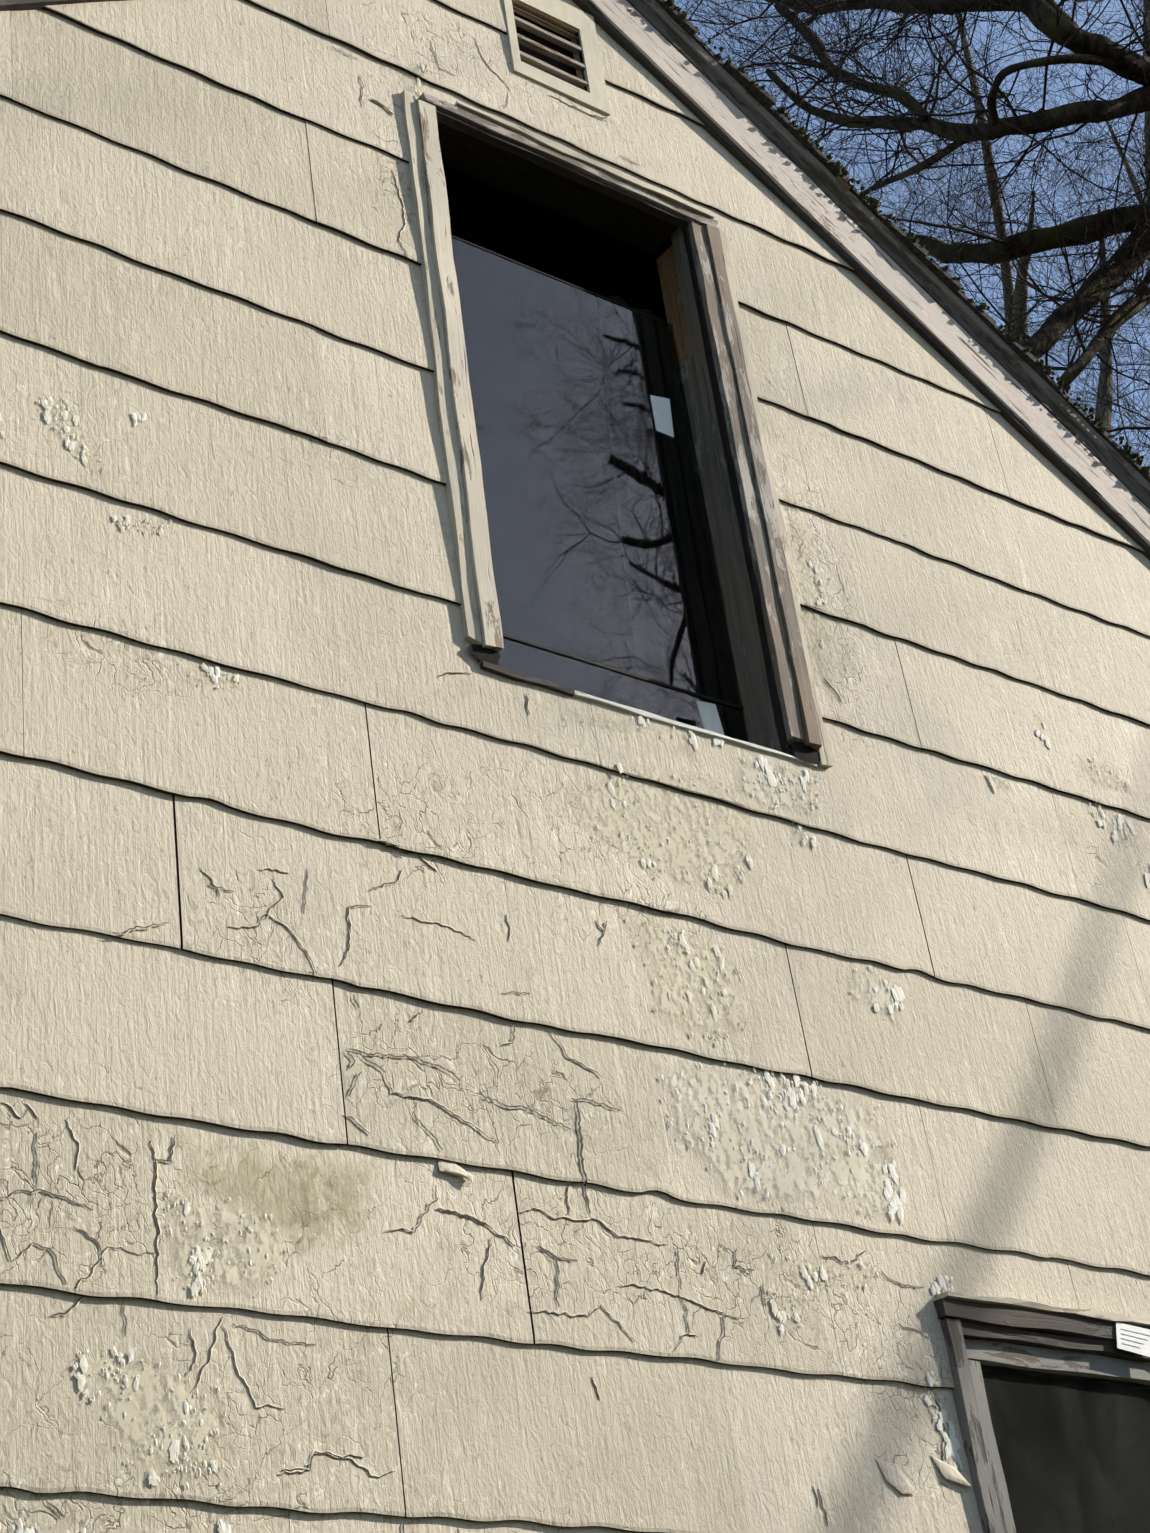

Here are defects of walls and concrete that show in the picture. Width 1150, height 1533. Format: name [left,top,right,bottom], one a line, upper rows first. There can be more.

peeling [33,393,105,473]
peeling [570,755,820,898]
peeling [1089,803,1150,888]
crack [201,838,512,1008]
crack [597,919,607,945]
peeling [627,917,750,1046]
peeling [851,965,905,1025]
crack [0,1102,177,1337]
crack [344,991,766,1360]
peeling [661,1062,906,1224]
peeling [72,1346,226,1490]
peeling [218,1520,231,1533]